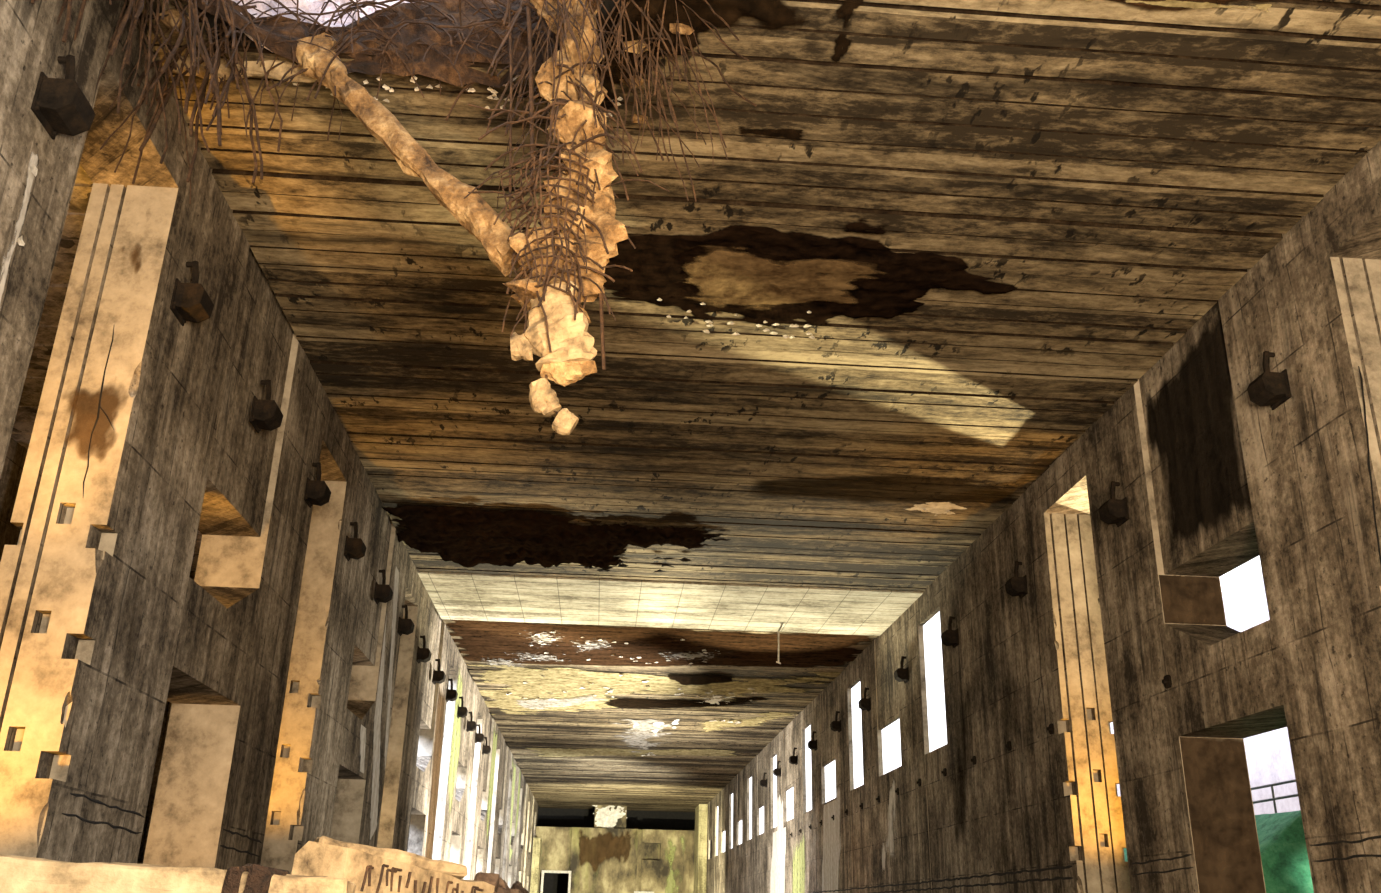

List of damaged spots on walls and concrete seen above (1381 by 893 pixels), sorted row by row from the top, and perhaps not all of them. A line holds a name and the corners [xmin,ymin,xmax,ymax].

spalling [170,0,560,109]
spalling [603,218,1018,339]